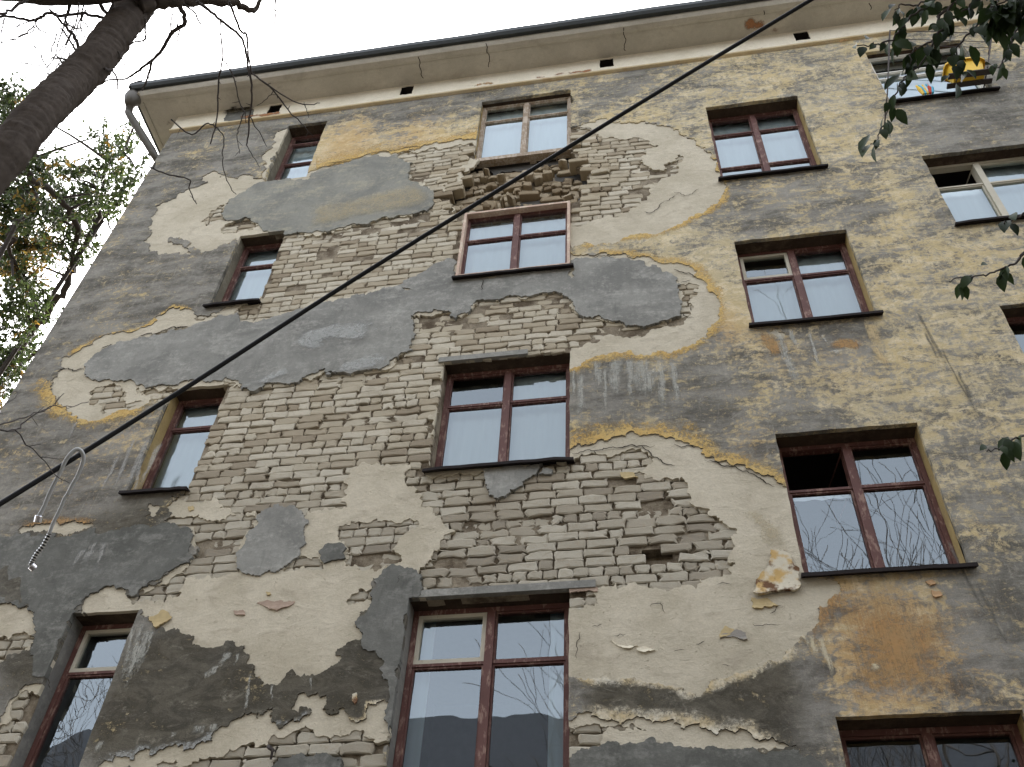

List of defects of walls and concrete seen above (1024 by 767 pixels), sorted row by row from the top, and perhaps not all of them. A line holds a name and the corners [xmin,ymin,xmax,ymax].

flaking render [34,119,841,699]
leakage [594,360,679,401]
flaking render [0,603,36,662]
leakage [802,635,833,669]
flaking render [0,684,45,767]
flaking render [99,692,392,767]
flaking render [569,706,795,767]